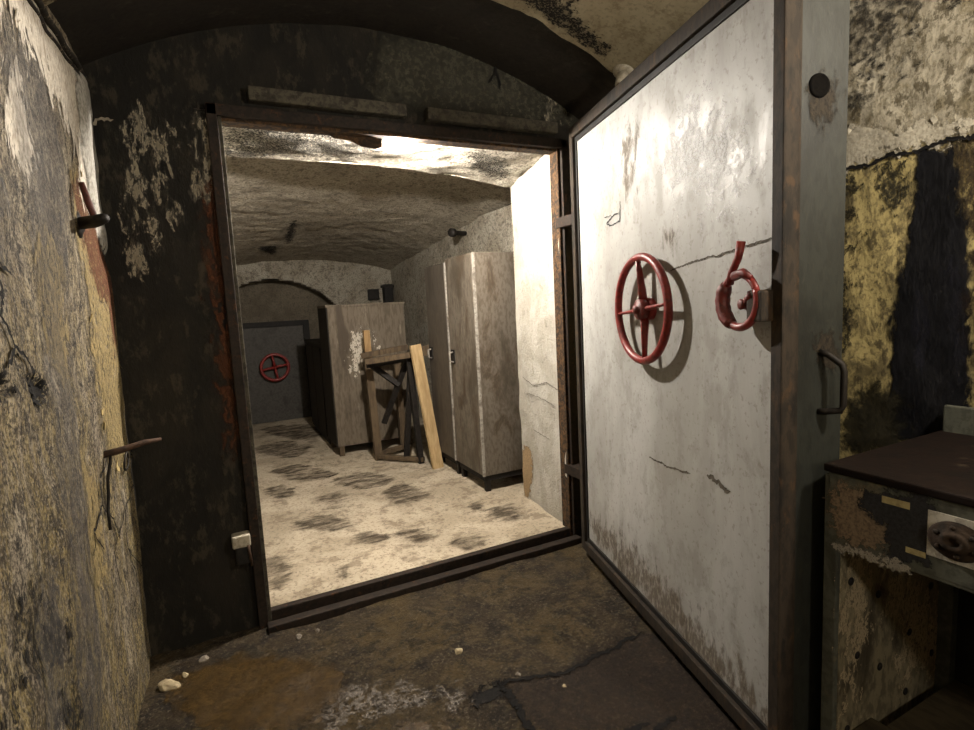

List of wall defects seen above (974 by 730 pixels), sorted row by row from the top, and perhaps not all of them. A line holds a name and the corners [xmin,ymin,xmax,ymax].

leakage [516,0,618,63]
leakage [848,0,922,114]
leakage [117,99,183,283]
leakage [190,111,214,203]
leakage [844,158,914,261]
peeling [846,115,974,173]
crack [846,134,974,170]
leakage [944,126,974,237]
peeling [0,0,132,617]
leakage [842,271,858,354]
leakage [0,567,91,730]
crack [497,631,642,730]